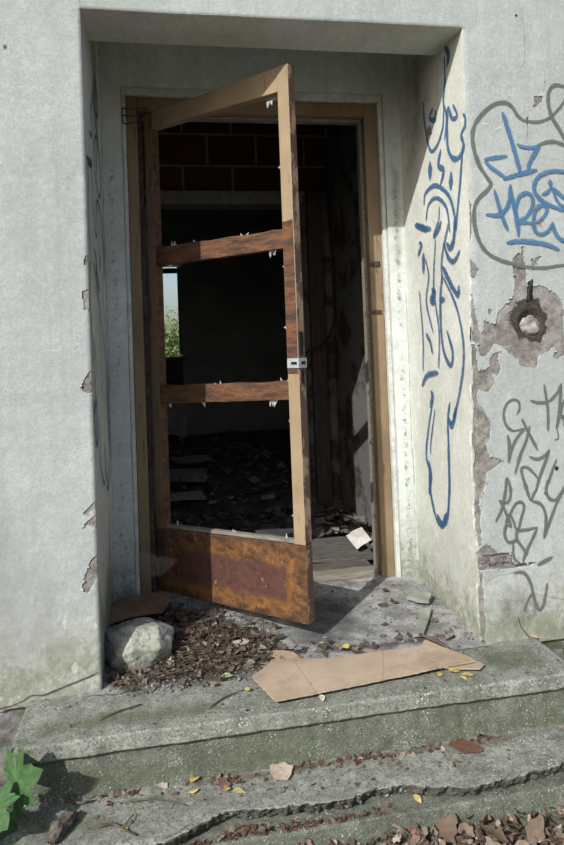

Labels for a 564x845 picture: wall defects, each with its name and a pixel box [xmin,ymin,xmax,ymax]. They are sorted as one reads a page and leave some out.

peeling [79,372,92,393]
flaking render [470,246,564,641]
peeling [82,502,96,529]
peeling [81,556,98,592]